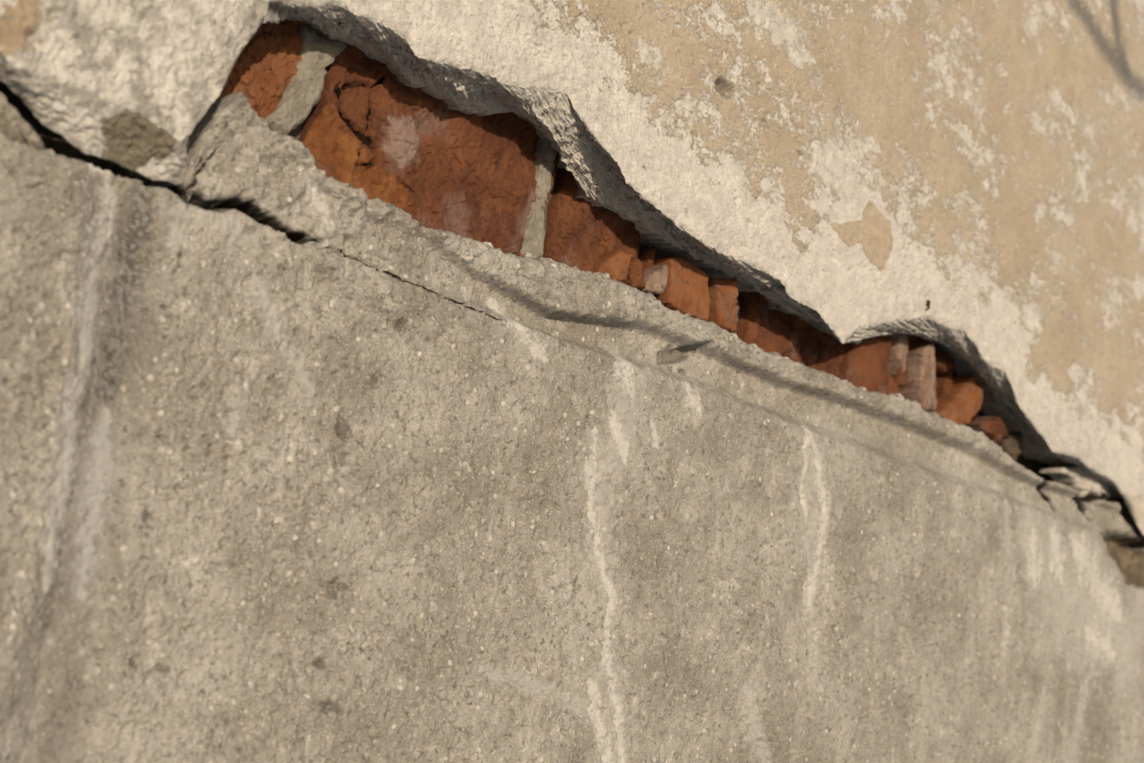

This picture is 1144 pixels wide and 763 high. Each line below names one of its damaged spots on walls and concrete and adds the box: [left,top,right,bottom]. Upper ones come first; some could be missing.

crack [334,77,385,168]
crack [164,145,499,320]
spalling [230,0,1124,499]
leakage [612,353,636,398]
leakage [650,414,660,450]
leakage [683,382,702,418]
leakage [798,424,832,622]
crack [1036,480,1111,513]
leakage [582,410,630,763]